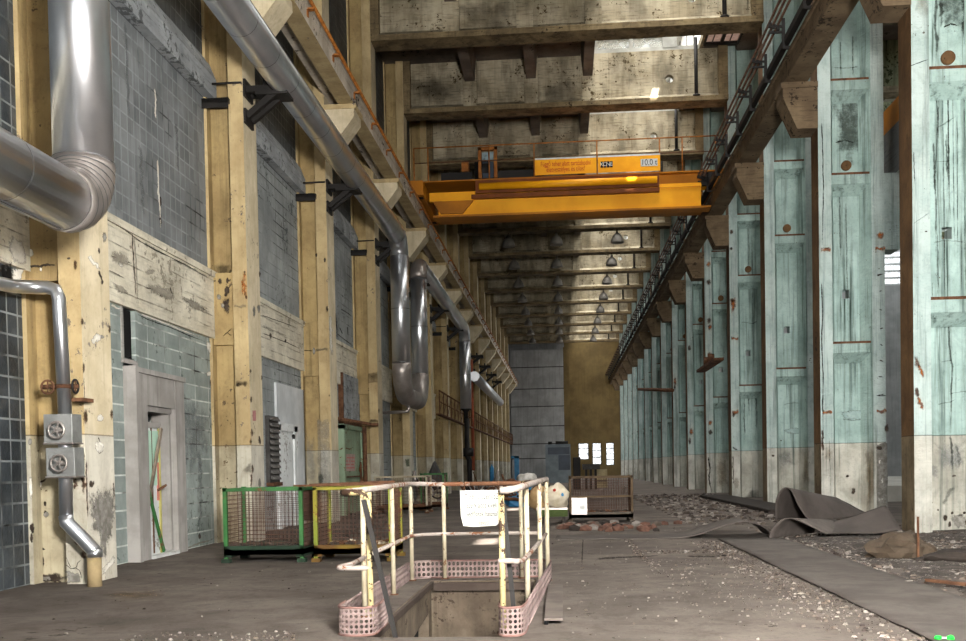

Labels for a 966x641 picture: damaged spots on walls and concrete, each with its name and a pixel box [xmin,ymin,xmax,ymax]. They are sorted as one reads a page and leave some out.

damp [934,0,964,52]
damp [836,103,858,150]
spalling [147,286,207,311]
spalling [217,278,230,313]
spalling [89,481,116,573]